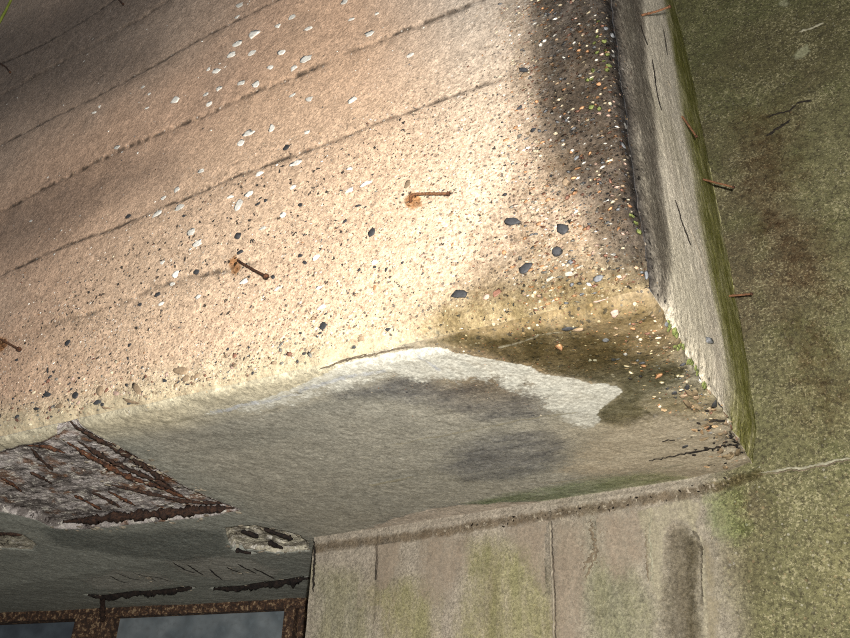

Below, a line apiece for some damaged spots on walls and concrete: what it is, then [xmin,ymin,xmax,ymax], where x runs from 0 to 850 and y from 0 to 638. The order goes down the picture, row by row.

spalling [0,0,744,532]
water stain [206,340,622,429]
corrosion [88,586,193,601]
corrosion [213,576,309,592]
spalling [225,525,313,555]
water stain [606,500,717,638]